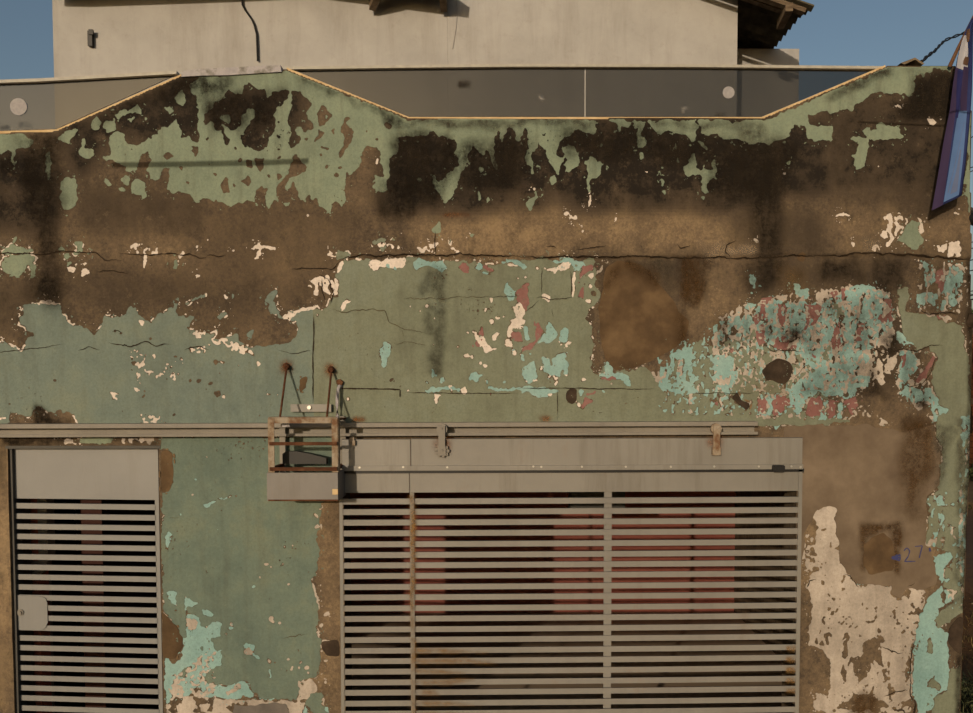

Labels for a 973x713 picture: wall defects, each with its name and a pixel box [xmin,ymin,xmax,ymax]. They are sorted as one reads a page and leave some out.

damp [161,79,270,128]
damp [899,74,953,119]
damp [379,119,525,217]
damp [711,127,788,289]
peeling [954,113,971,215]
damp [36,271,60,304]
crack [0,250,224,274]
crack [283,231,964,395]
crack [409,387,640,412]
peeling [0,212,971,713]